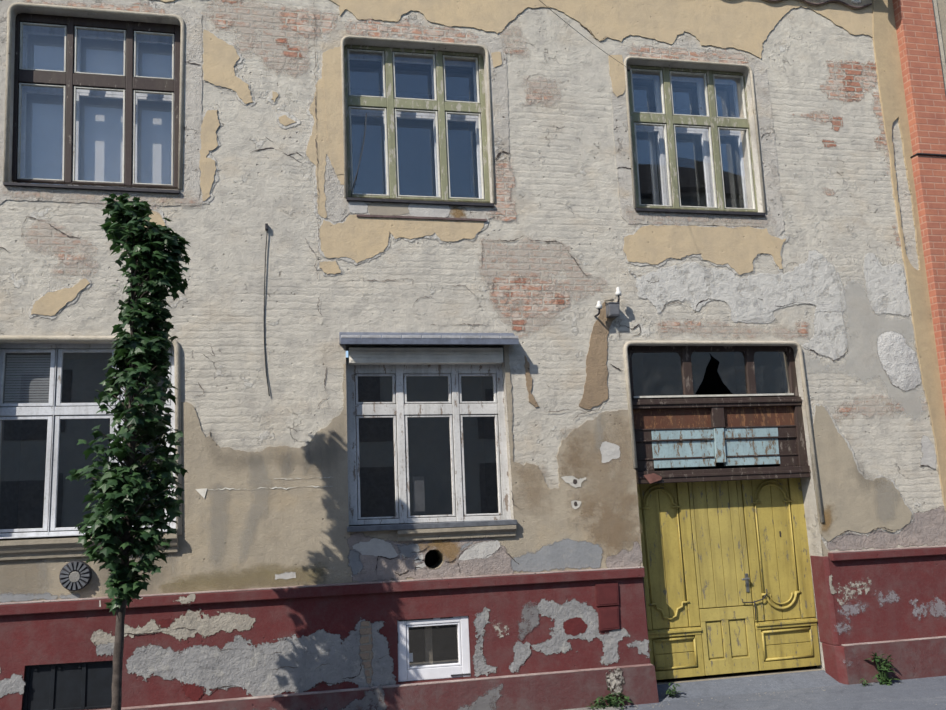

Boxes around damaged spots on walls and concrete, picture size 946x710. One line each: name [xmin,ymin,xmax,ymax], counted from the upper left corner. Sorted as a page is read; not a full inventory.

flaking render [0,0,946,552]
flaking render [347,532,514,582]
peeling [829,575,946,635]
peeling [90,593,396,710]
peeling [472,598,651,696]
peeling [0,668,26,698]
peeling [457,684,503,710]